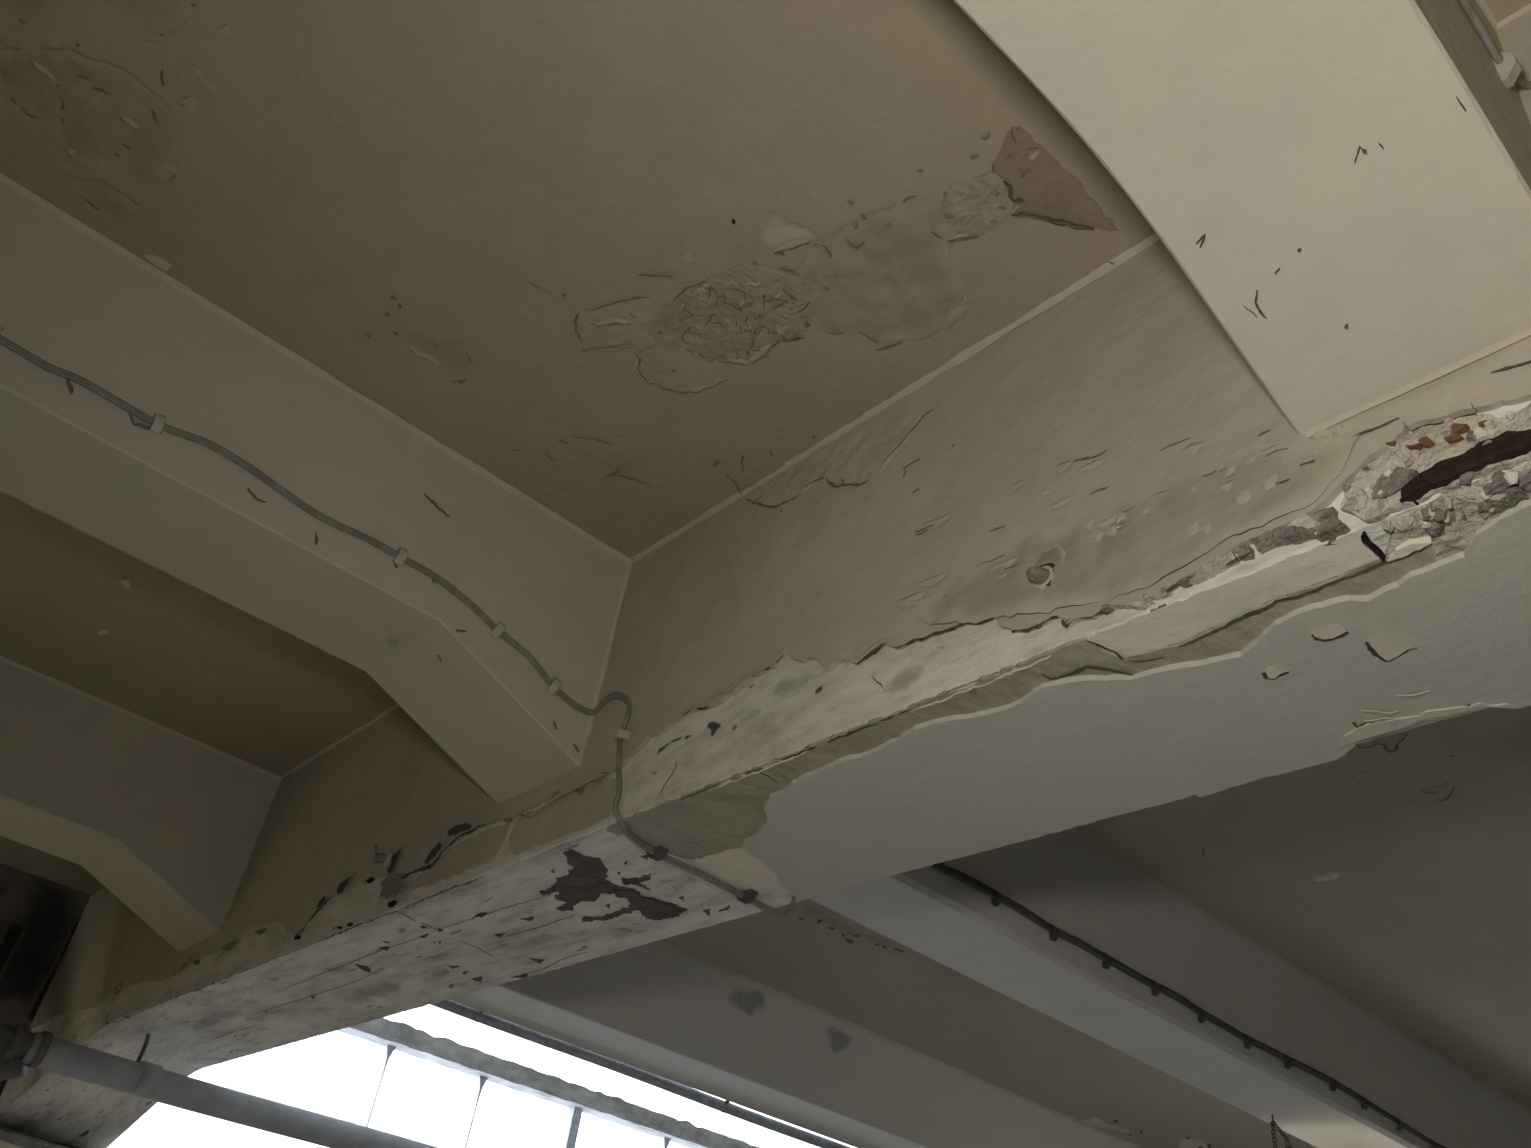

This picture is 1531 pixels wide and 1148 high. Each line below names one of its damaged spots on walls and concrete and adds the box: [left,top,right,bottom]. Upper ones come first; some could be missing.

peeling [931,126,1119,268]
flaking render [539,392,1531,923]
damp [24,914,82,1024]
peeling [798,900,903,952]